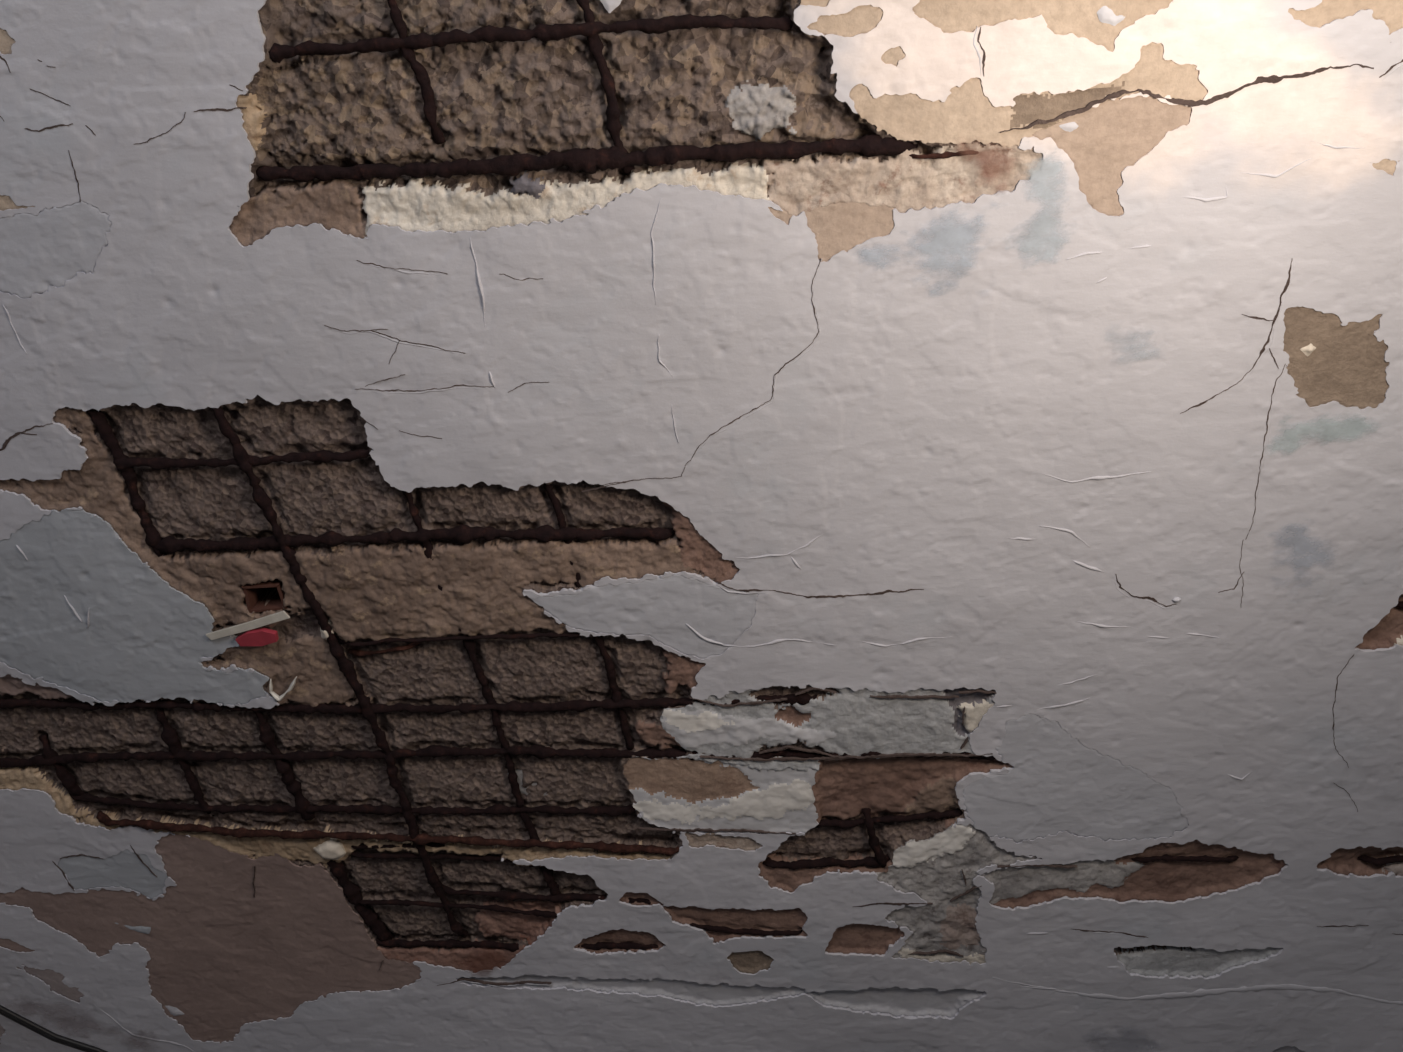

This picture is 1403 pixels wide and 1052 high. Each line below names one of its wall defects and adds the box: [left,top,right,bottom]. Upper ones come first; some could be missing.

peeling [0,28,16,54]
peeling [1288,0,1403,35]
spalling [229,0,1208,262]
crack [1000,59,1403,133]
crack [582,258,822,493]
peeling [1283,306,1389,409]
crack [1180,258,1295,603]
spalling [1355,594,1403,650]
spalling [0,395,1287,1044]
spalling [1317,846,1403,876]